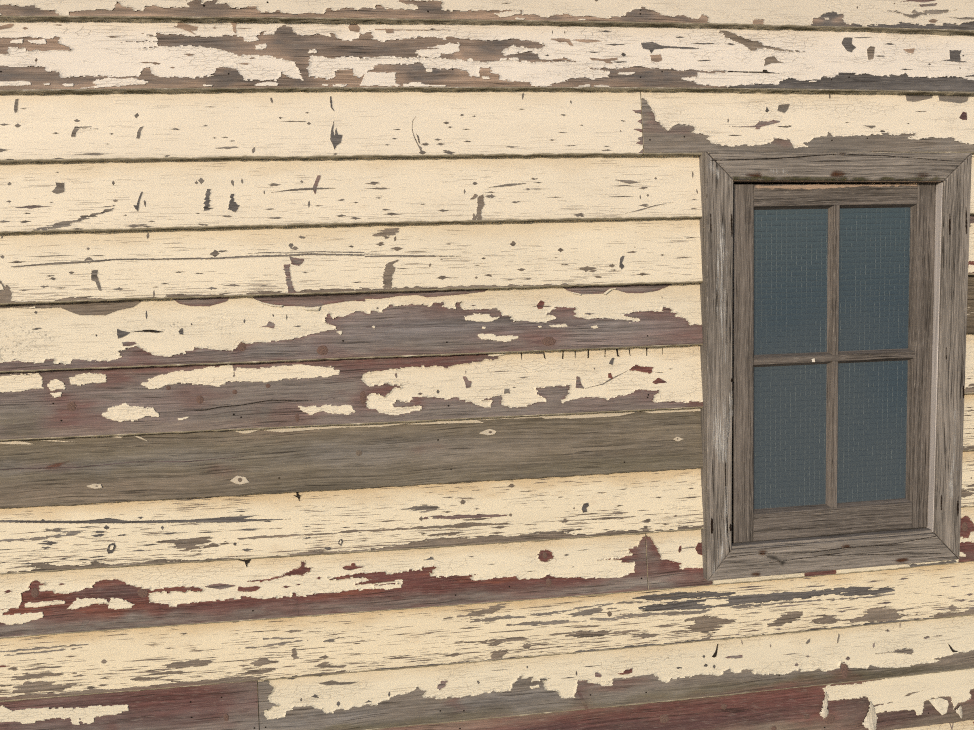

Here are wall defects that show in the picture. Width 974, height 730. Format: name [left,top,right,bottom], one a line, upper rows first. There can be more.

peeling [0,0,974,155]
peeling [0,175,703,442]
peeling [0,477,974,730]